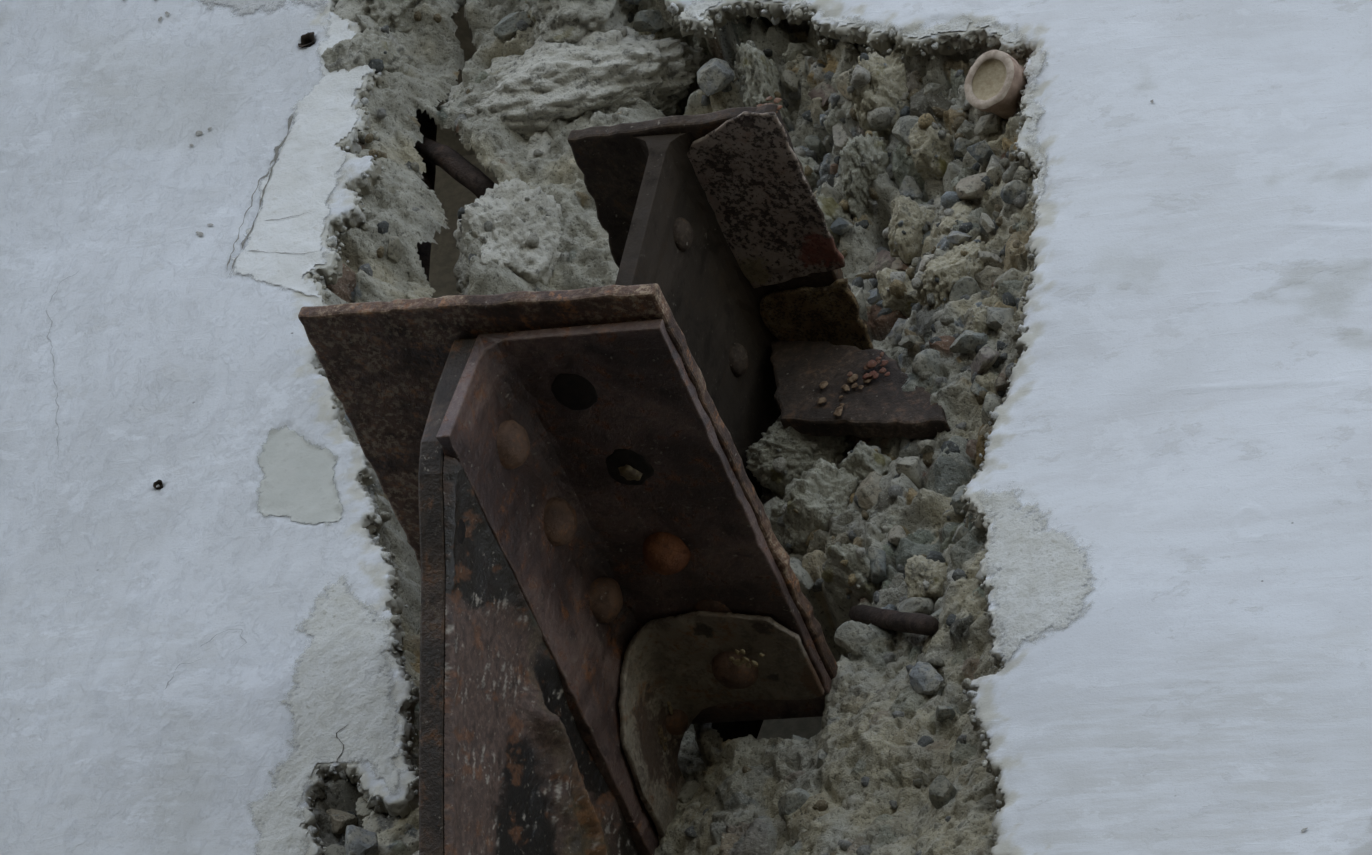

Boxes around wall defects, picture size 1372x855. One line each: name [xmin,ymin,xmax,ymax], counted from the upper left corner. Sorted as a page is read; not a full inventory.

spalling [200,0,1096,855]
corrosion [817,352,890,417]